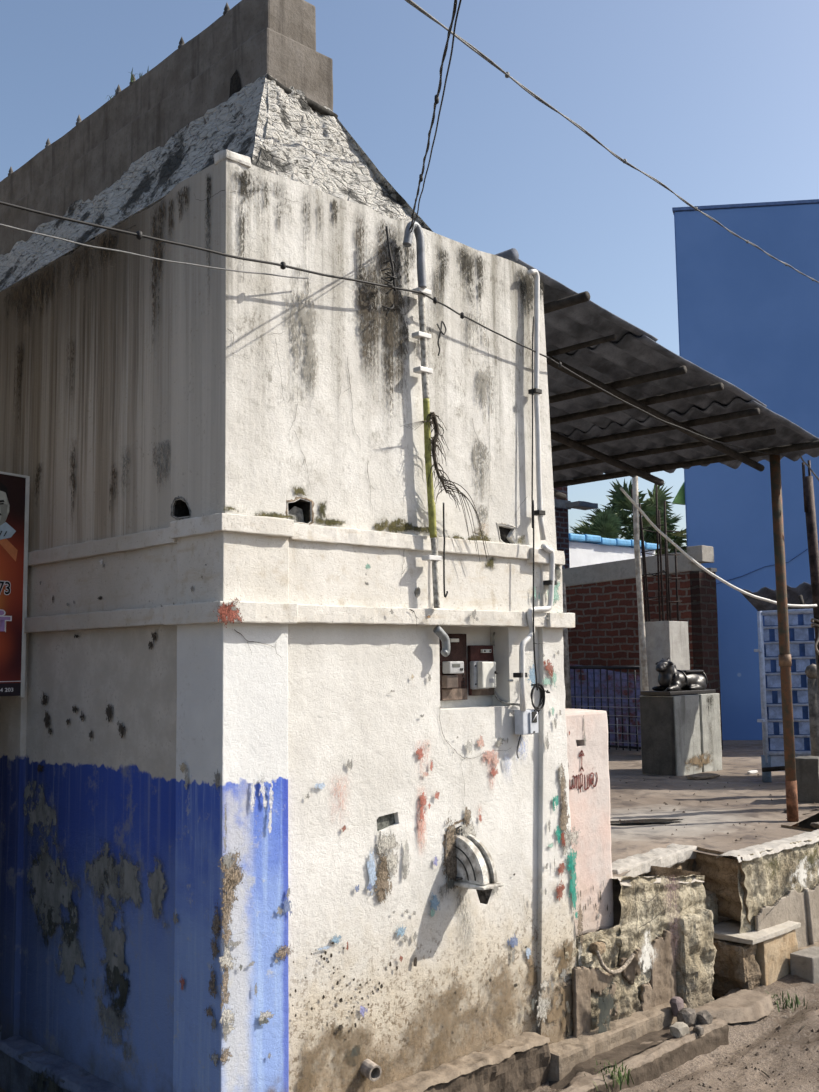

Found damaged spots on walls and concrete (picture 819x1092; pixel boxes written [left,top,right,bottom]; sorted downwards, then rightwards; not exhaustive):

leakage [152,186,188,325]
leakage [356,219,416,425]
spalling [213,598,245,628]
peeling [416,744,433,777]
peeling [457,735,508,777]
spalling [355,792,440,942]
spalling [433,807,482,891]
spalling [204,804,255,1067]
spalling [308,934,417,1040]
peeling [507,933,533,967]
leakage [297,1034,325,1092]